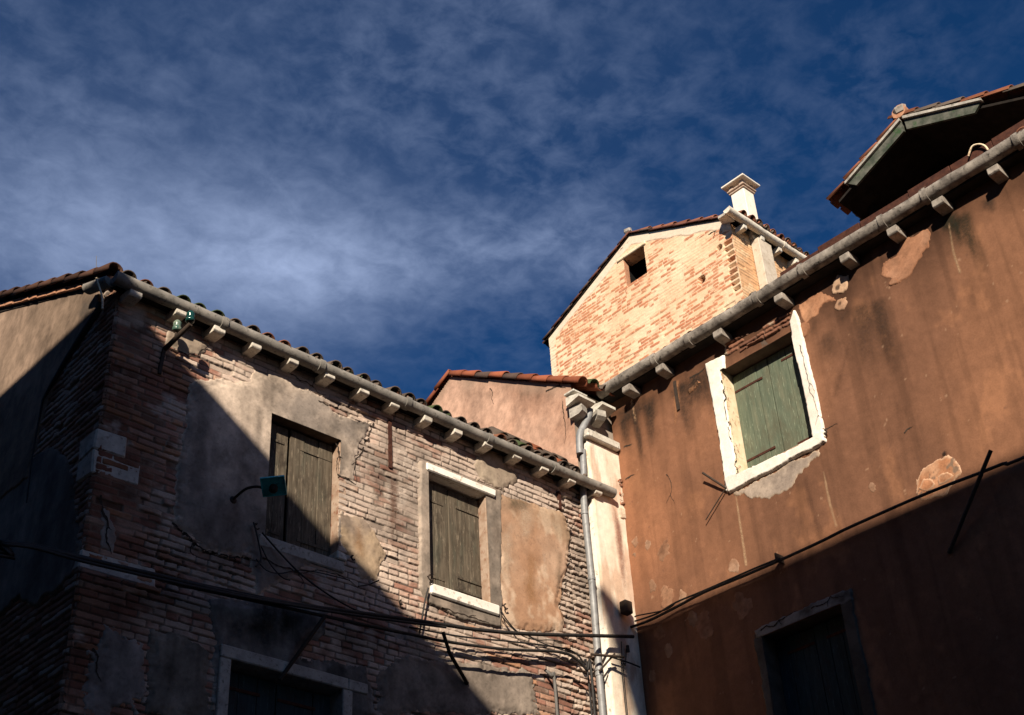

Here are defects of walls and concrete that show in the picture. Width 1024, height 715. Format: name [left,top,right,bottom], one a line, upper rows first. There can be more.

flaking render [881,229,931,286]
flaking render [724,275,849,355]
crack [800,346,837,429]
crack [336,423,374,485]
flaking render [916,451,962,500]